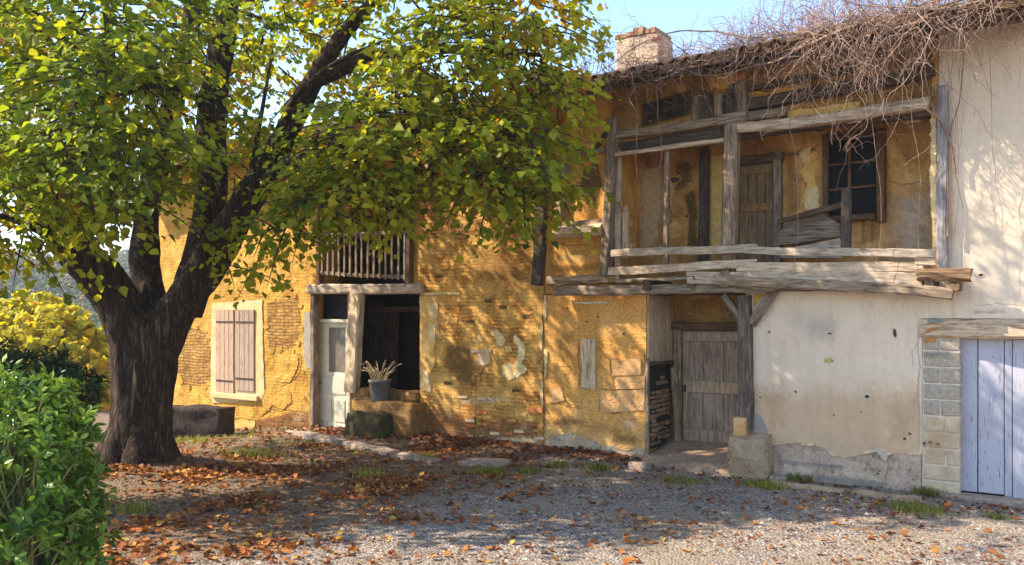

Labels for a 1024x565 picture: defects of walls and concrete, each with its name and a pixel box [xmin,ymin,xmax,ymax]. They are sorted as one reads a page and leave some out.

flaking render [789,146,820,210]
spalling [427,380,545,440]
peeling [502,361,527,392]
crack [911,324,921,448]
flaking render [772,431,940,491]